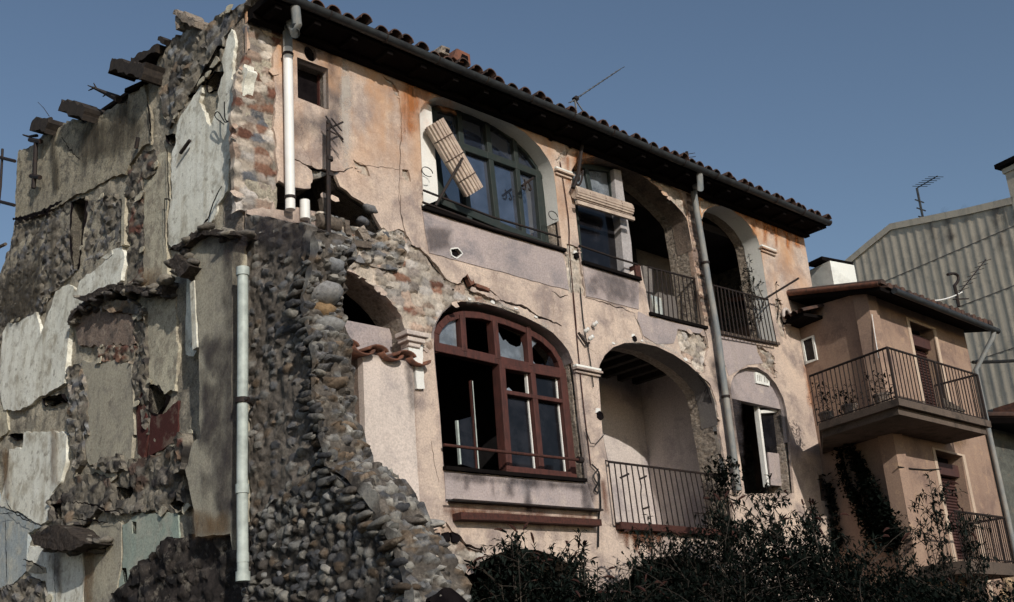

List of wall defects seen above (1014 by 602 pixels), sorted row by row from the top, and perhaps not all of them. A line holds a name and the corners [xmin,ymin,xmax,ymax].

spalling [0,0,259,345]
spalling [276,162,518,352]
spalling [84,295,171,435]
spalling [645,176,732,488]
spalling [42,364,195,534]
spalling [0,576,52,602]
spalling [111,534,255,602]
spalling [425,587,467,602]
spalling [434,523,485,575]